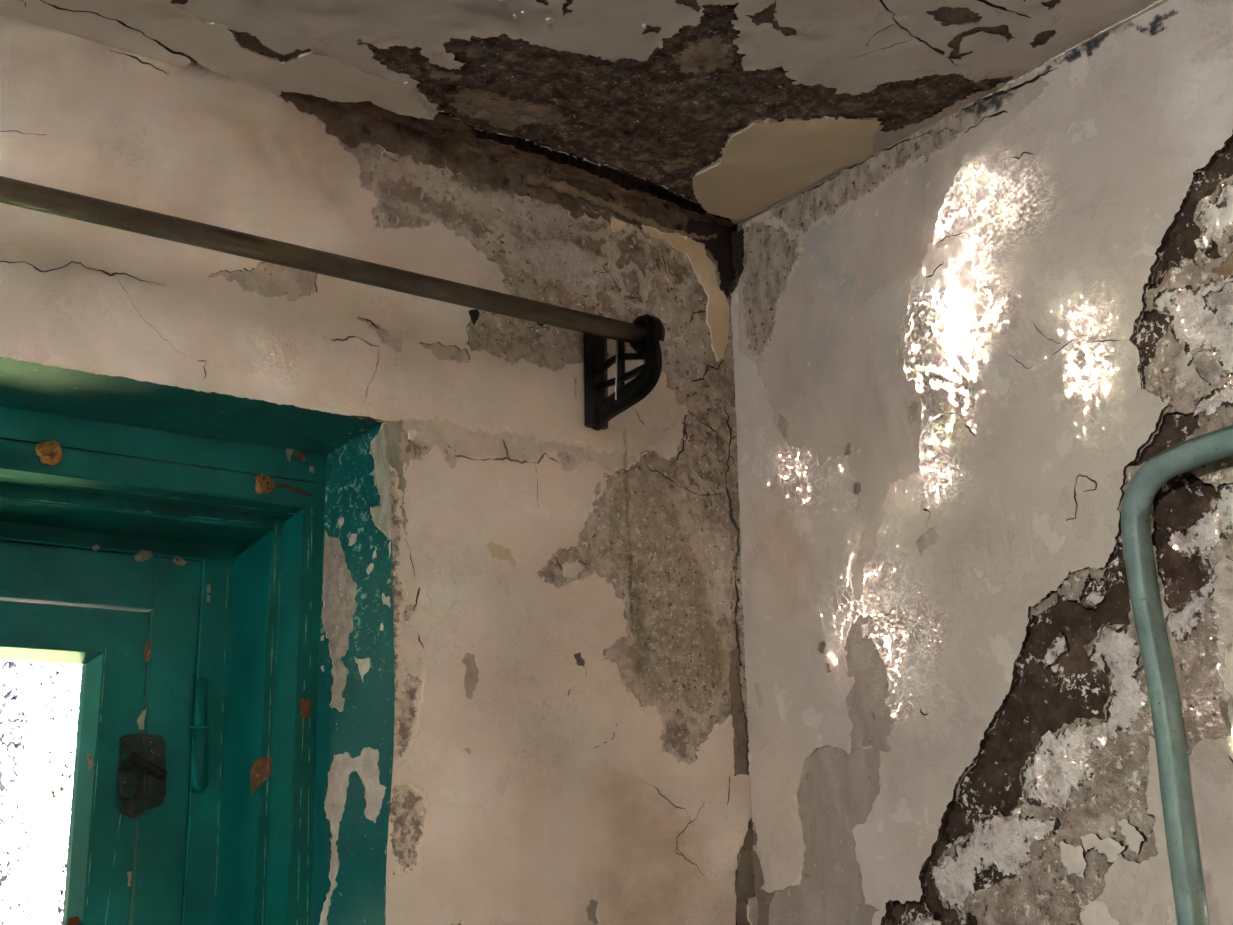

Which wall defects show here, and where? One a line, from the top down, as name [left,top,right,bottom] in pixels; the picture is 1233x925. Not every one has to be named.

crack [851,16,944,58]
crack [530,141,744,382]
spalling [1118,142,1233,512]
peeling [170,0,1158,880]
peeling [137,708,147,730]
peeling [135,550,153,562]
peeling [144,640,152,662]
crack [729,648,747,775]
spalling [1150,455,1233,756]
peeling [320,748,386,925]
crack [641,780,696,865]
peeling [586,899,598,925]